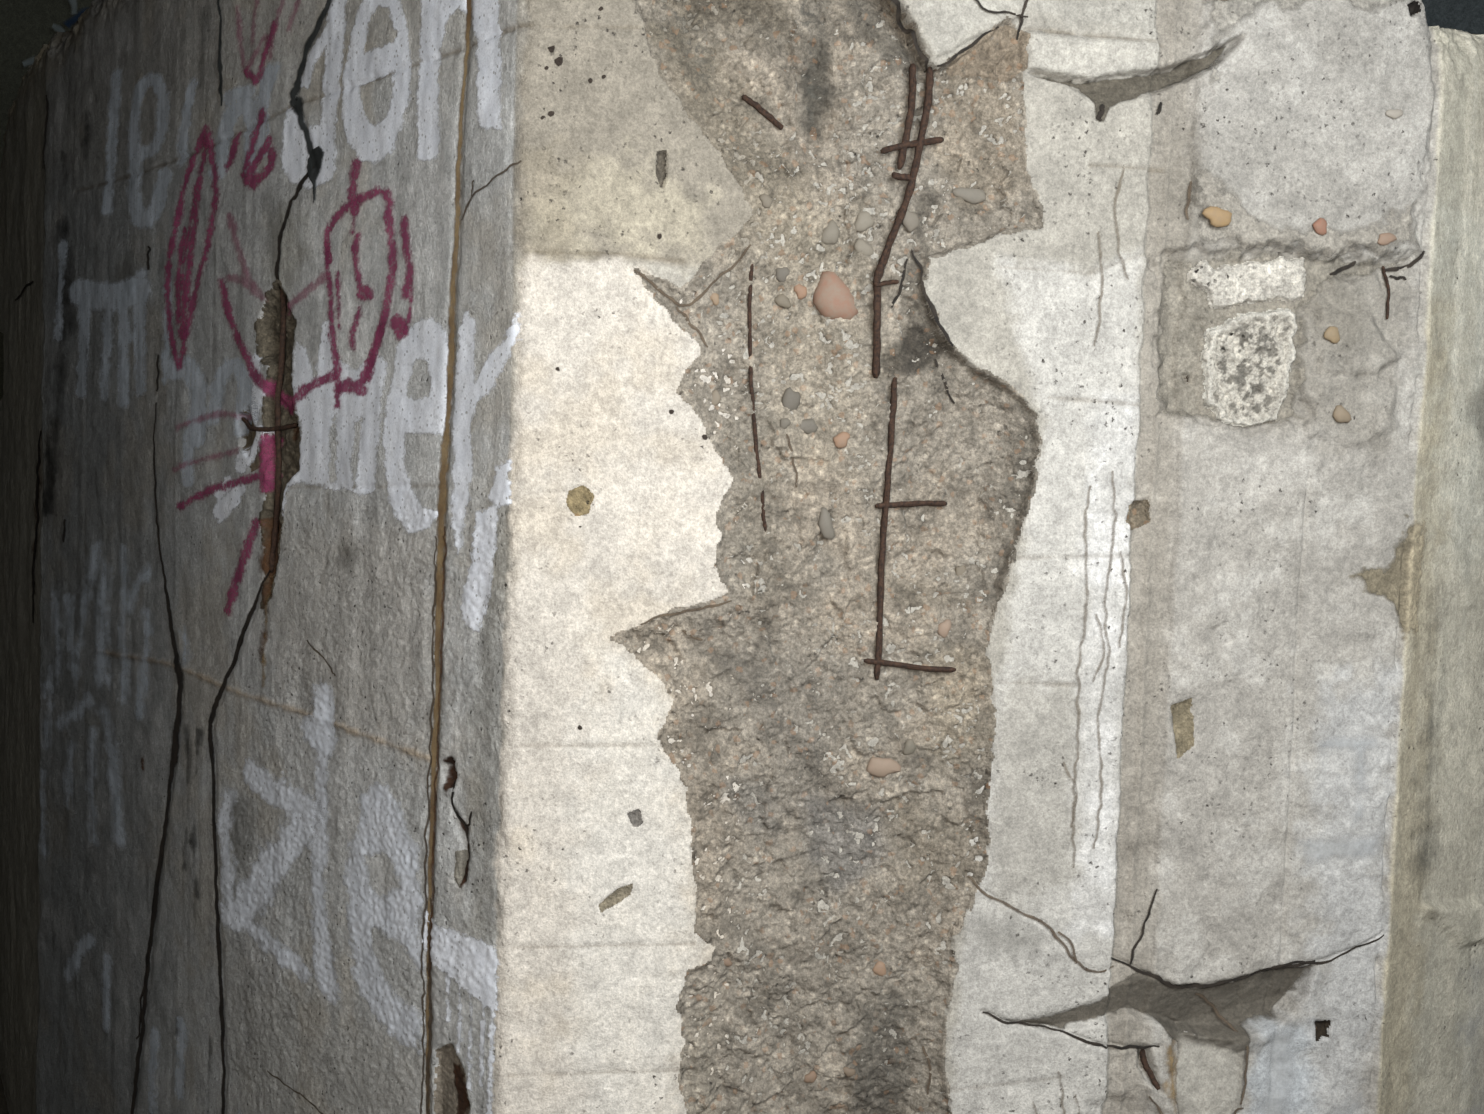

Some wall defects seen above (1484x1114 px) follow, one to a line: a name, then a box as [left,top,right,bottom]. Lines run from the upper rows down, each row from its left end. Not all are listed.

crack [216,0,224,106]
crack [275,0,331,289]
spalling [545,46,563,70]
spalling [1157,170,1420,424]
crack [131,355,270,1114]
spalling [239,279,301,609]
crack [307,640,335,676]
corrosion [420,0,472,1114]
spalling [610,0,1312,1114]
spalling [599,884,633,912]
crack [267,1070,323,1114]
spalling [433,1043,470,1114]